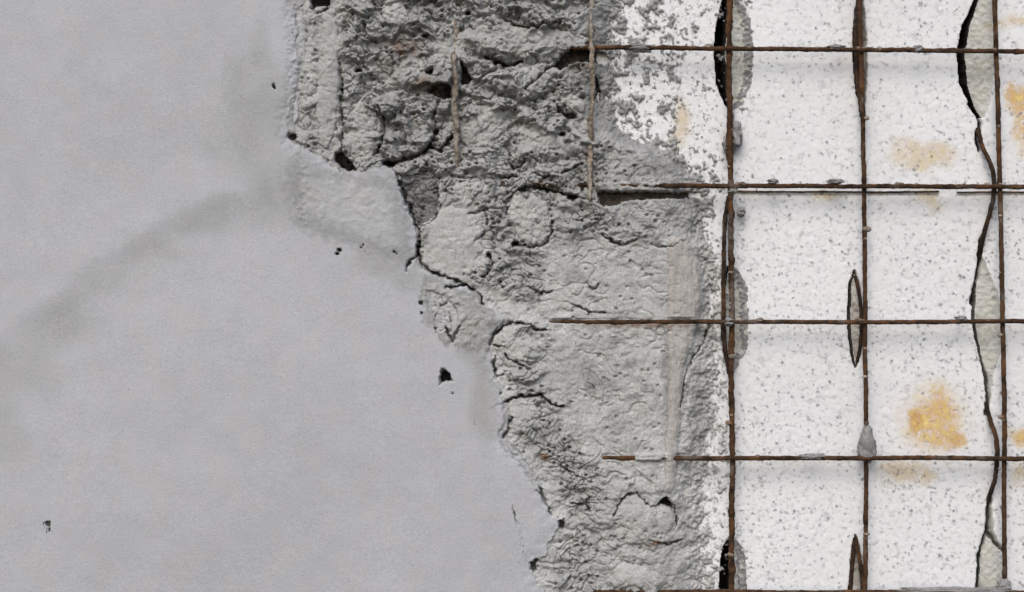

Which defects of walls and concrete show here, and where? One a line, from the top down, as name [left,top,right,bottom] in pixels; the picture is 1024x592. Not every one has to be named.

peeling [288,0,443,257]
hole [426,62,471,99]
hole [553,50,597,70]
corrosion [1006,85,1024,136]
crack [376,109,580,342]
hole [598,191,693,207]
crack [969,238,980,304]
peeling [419,276,502,352]
crack [490,322,564,438]
corrosion [909,388,965,448]
crack [981,369,989,415]
crack [979,504,1002,556]